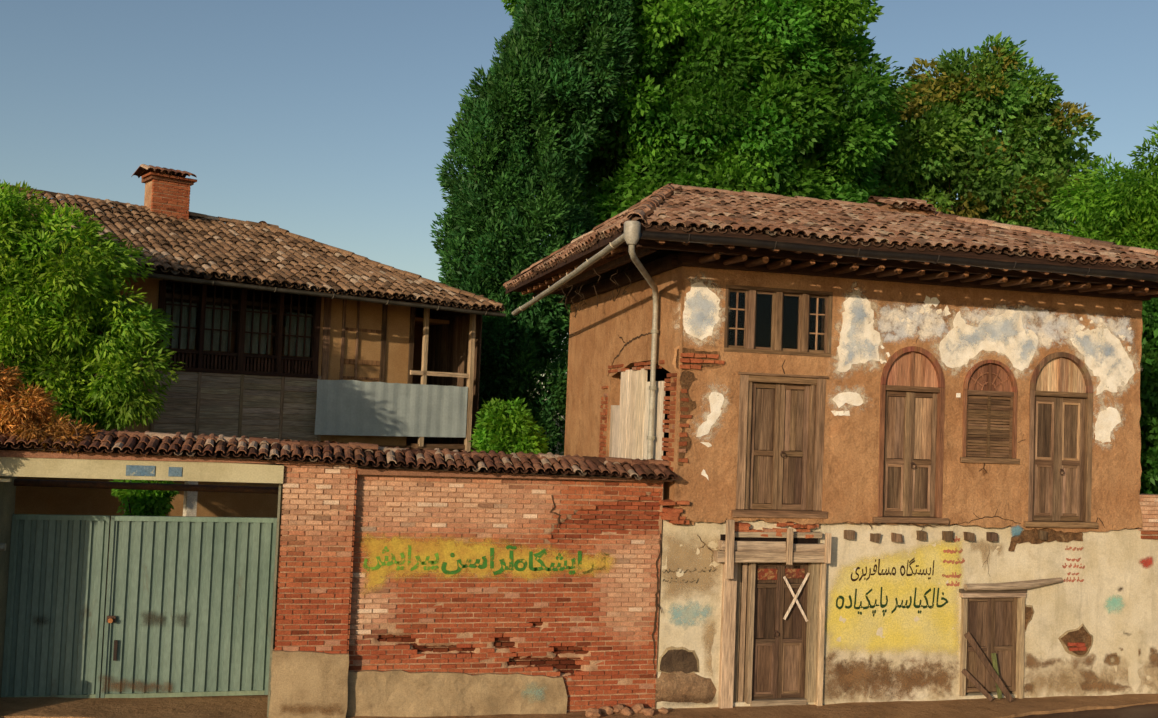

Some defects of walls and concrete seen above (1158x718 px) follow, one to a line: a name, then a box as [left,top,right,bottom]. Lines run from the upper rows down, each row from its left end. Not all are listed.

peeling [599,276,729,471]
peeling [829,283,1139,447]
crack [550,495,561,528]
spalling [1008,528,1083,552]
spalling [377,634,475,652]
spalling [493,636,589,674]
leakage [825,653,952,699]
spalling [1058,623,1093,657]
leakage [1024,649,1128,691]
leakage [1138,648,1158,676]